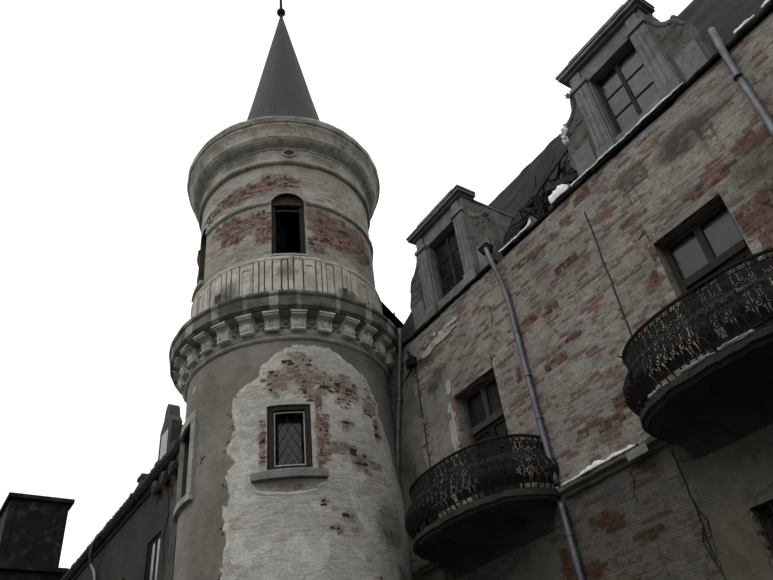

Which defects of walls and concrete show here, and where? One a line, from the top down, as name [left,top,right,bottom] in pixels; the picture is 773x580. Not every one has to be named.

spalling [205,174,299,247]
spalling [306,207,371,267]
flaking render [415,317,458,374]
flaking render [213,345,466,580]
crack [671,449,726,580]